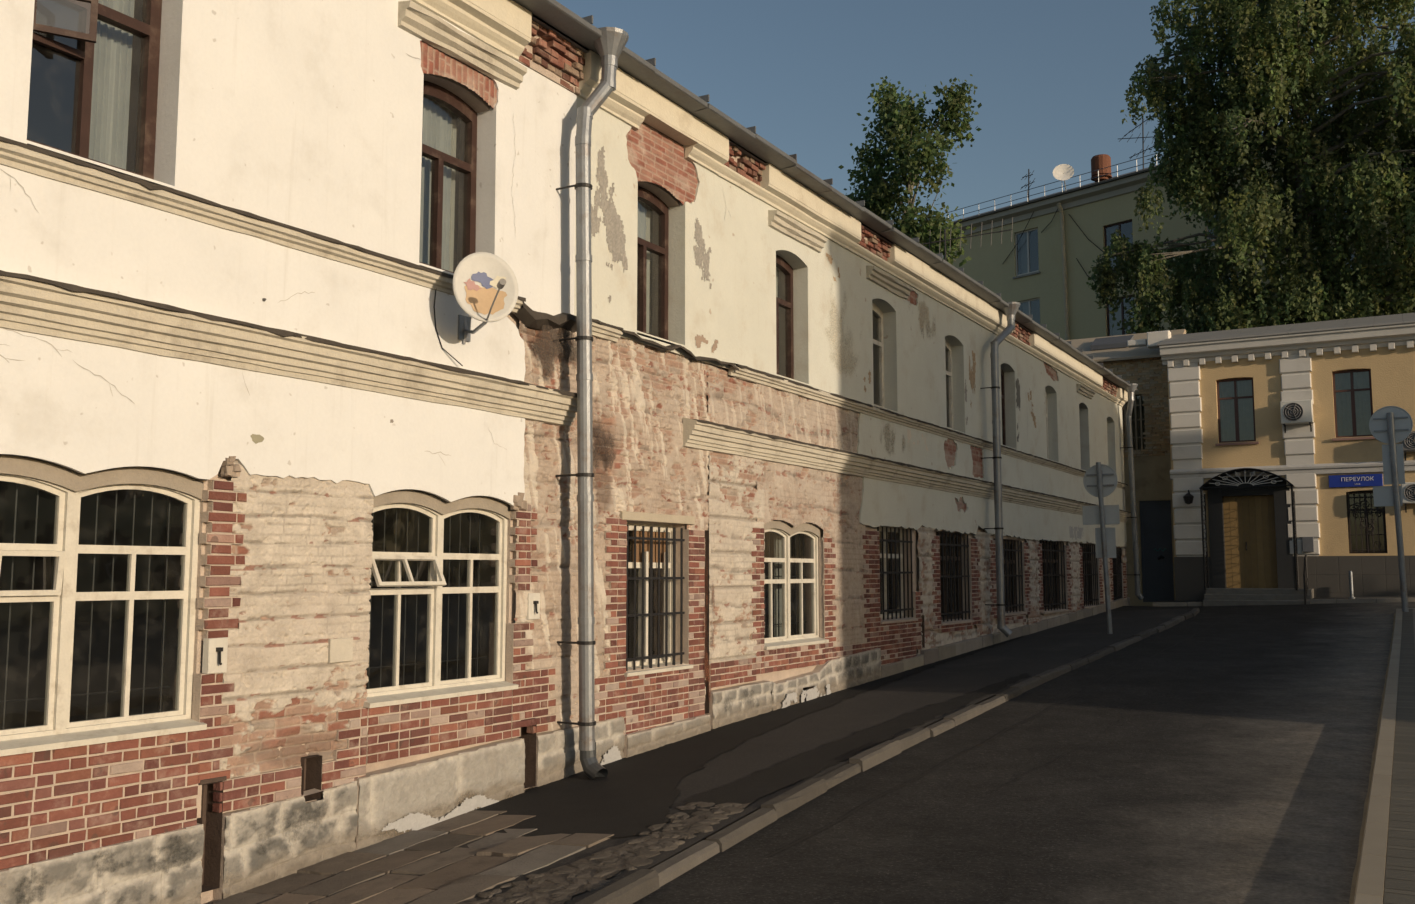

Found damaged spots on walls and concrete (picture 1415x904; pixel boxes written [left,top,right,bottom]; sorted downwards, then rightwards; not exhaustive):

flaking render [420,40,497,108]
peeling [591,146,628,270]
flaking render [626,122,712,289]
crack [0,329,134,403]
flaking render [514,321,867,732]
flaking render [219,461,374,779]